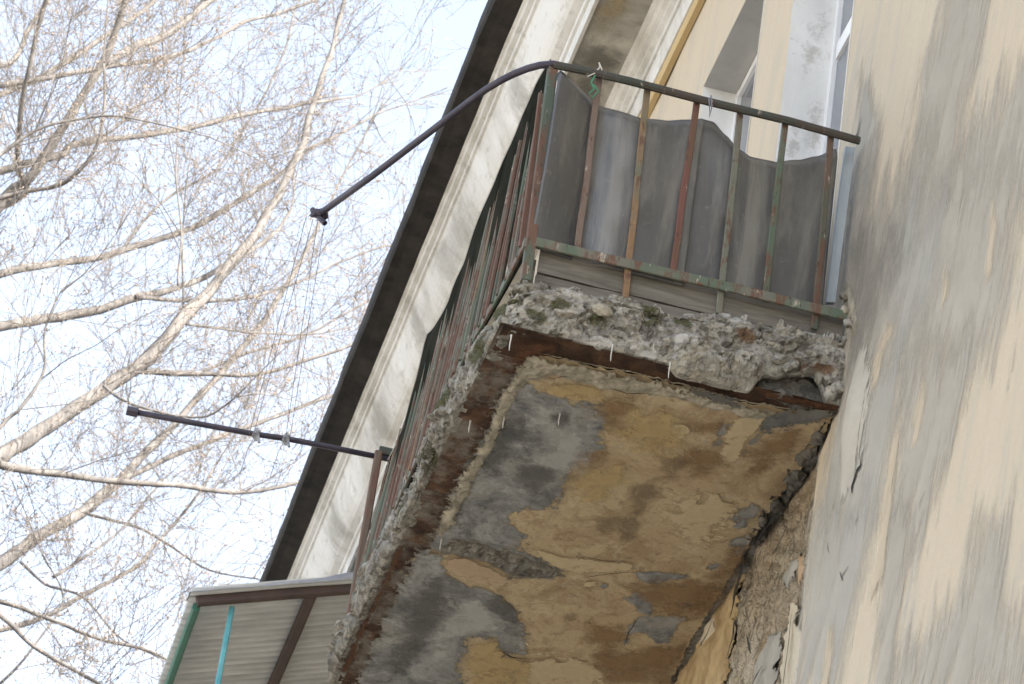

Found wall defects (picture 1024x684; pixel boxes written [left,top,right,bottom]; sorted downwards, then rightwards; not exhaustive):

rust [508,339,554,373]
leakage [484,405,593,495]
spalling [327,280,858,684]
crack [833,445,866,504]
crack [698,513,792,684]